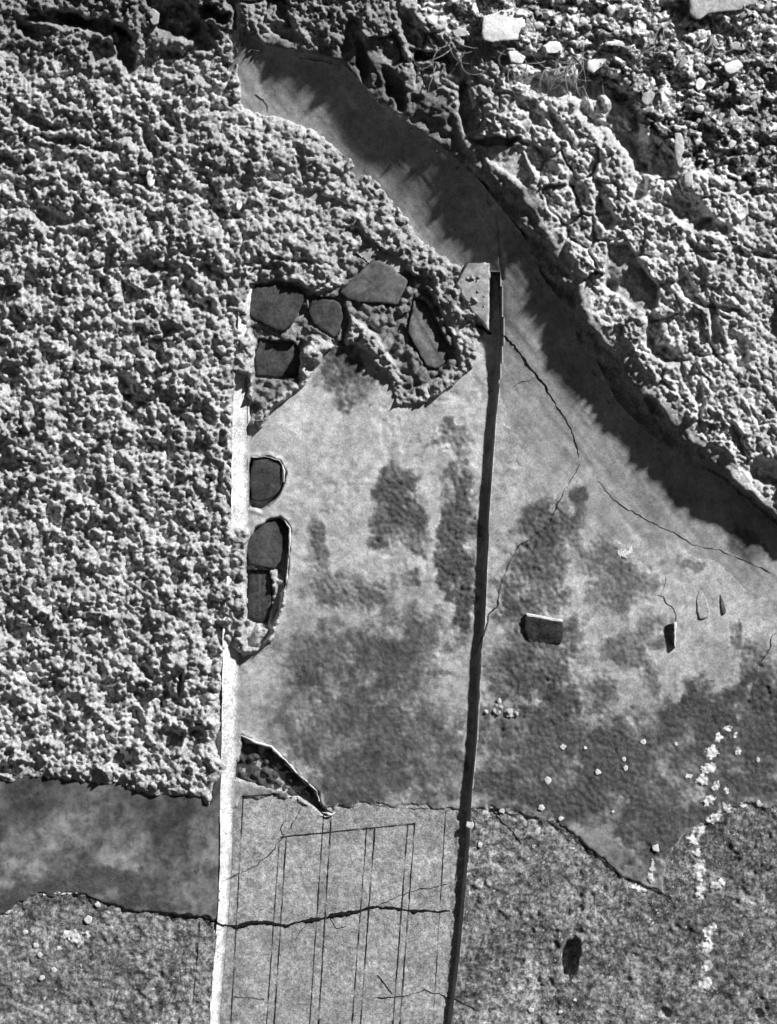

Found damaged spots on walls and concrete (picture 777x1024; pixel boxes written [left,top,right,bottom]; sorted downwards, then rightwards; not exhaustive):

flaking render [0,0,777,816]
water stain [274,417,777,899]
crack [474,323,581,654]
crack [604,488,769,572]
crack [158,883,450,937]